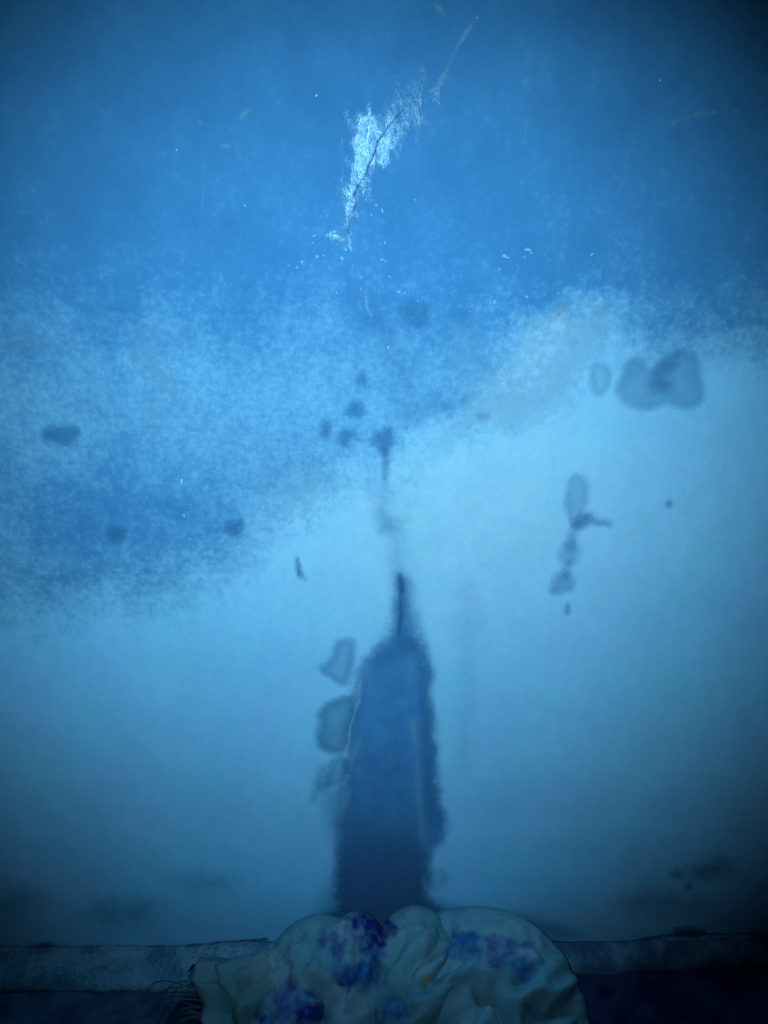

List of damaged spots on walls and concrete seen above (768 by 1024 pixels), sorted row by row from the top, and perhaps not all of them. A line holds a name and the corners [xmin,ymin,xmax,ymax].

water stain [319,585,444,928]